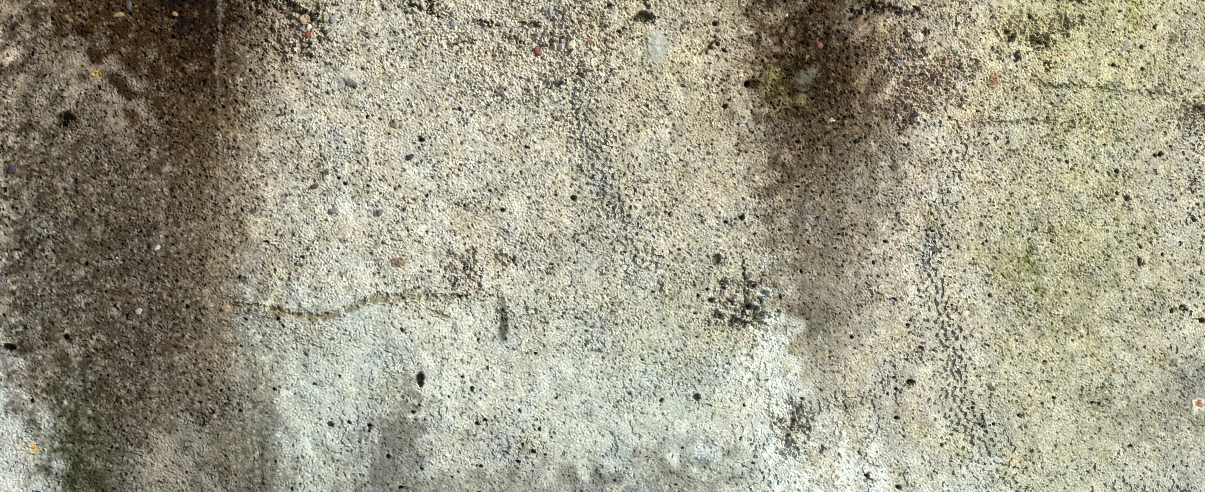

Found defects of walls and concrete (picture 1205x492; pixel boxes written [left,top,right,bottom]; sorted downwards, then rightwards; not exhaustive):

crack [227,286,469,325]
leakage [0,0,960,492]